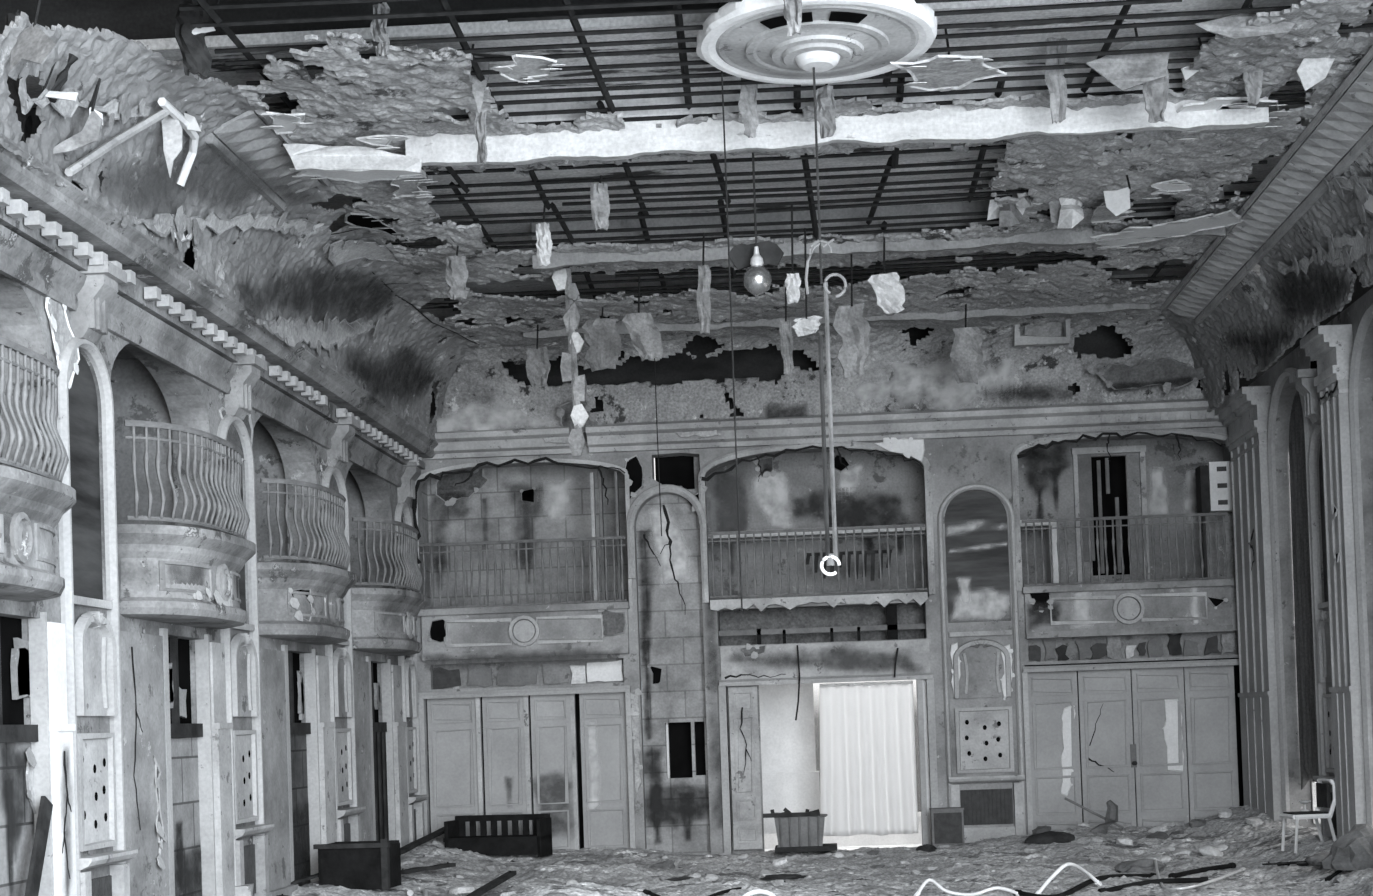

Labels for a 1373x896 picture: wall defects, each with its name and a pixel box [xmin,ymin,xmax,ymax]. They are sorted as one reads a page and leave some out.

peeling [18,77,151,130]
peeling [1176,97,1292,128]
peeling [121,206,314,252]
peeling [289,168,438,200]
peeling [1090,179,1243,250]
spalling [45,297,80,389]
peeling [256,311,381,359]
water stain [511,480,568,582]
crack [643,505,686,608]
water stain [1024,446,1067,535]
water stain [640,509,722,842]
water stain [1,744,35,892]